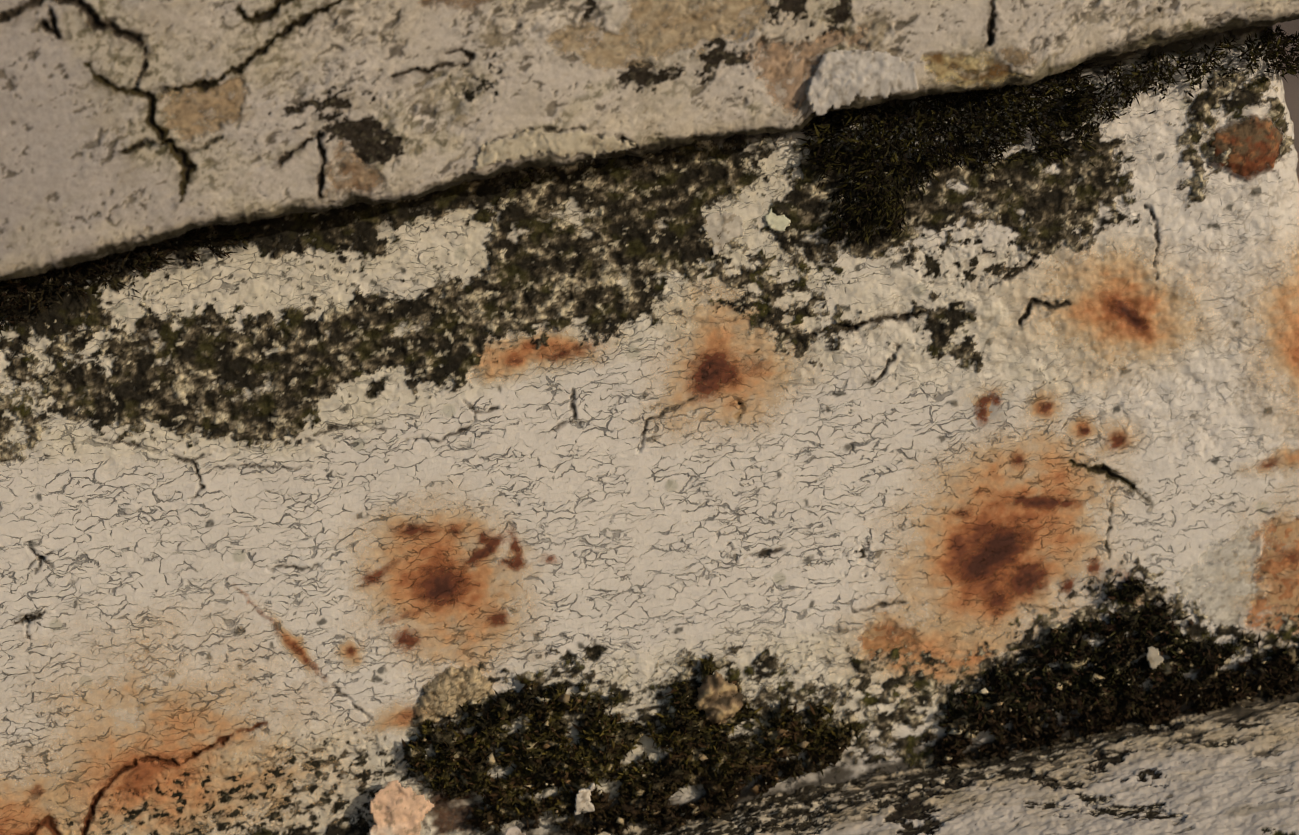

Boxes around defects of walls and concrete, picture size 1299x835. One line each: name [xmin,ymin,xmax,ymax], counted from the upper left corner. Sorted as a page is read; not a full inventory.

crack [0,0,342,203]
spalling [420,0,490,11]
spalling [548,0,1035,115]
rust [665,300,790,427]
rust [1050,252,1193,360]
crack [15,611,45,638]
crack [173,423,384,498]
rust [362,512,523,669]
rust [861,390,1132,685]
crack [1069,459,1152,558]
crack [27,722,267,835]
rust [0,674,305,835]